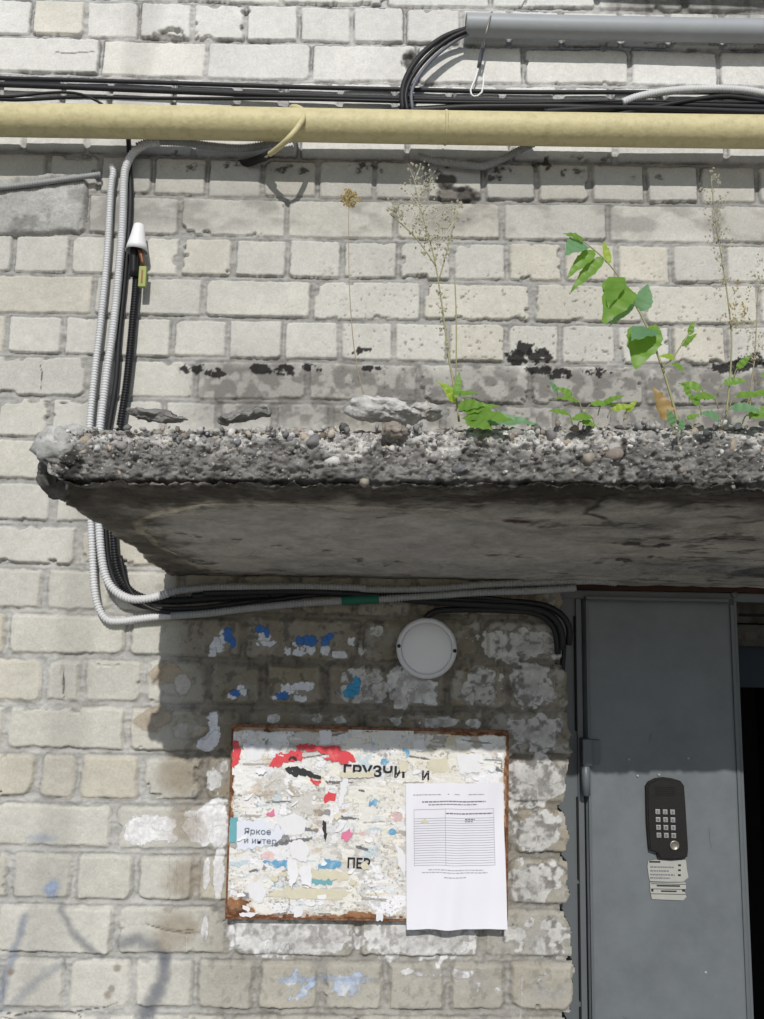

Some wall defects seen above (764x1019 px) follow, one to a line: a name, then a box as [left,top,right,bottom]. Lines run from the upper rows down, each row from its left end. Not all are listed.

spalling [29,420,764,502]
water stain [57,448,764,578]